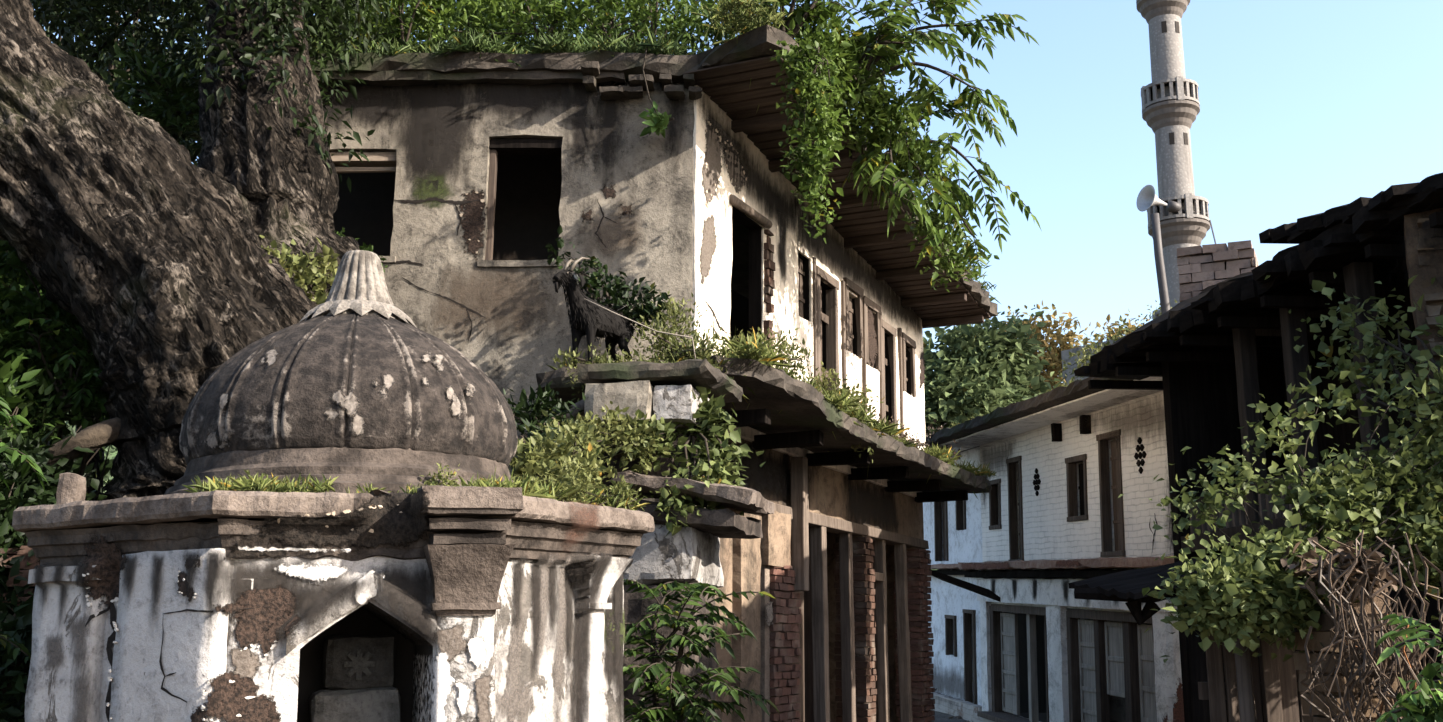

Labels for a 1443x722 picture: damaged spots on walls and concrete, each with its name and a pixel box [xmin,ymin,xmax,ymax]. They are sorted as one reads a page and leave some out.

leakage [319,81,629,188]
flaking render [699,119,747,284]
peeling [324,390,365,435]
peeling [422,351,476,418]
leakage [34,562,93,722]
crack [85,584,119,722]
leakage [123,556,136,596]
leakage [151,555,163,610]
crack [159,607,260,703]
flaking render [190,546,385,722]
peeling [412,622,492,722]
leakage [497,552,634,722]